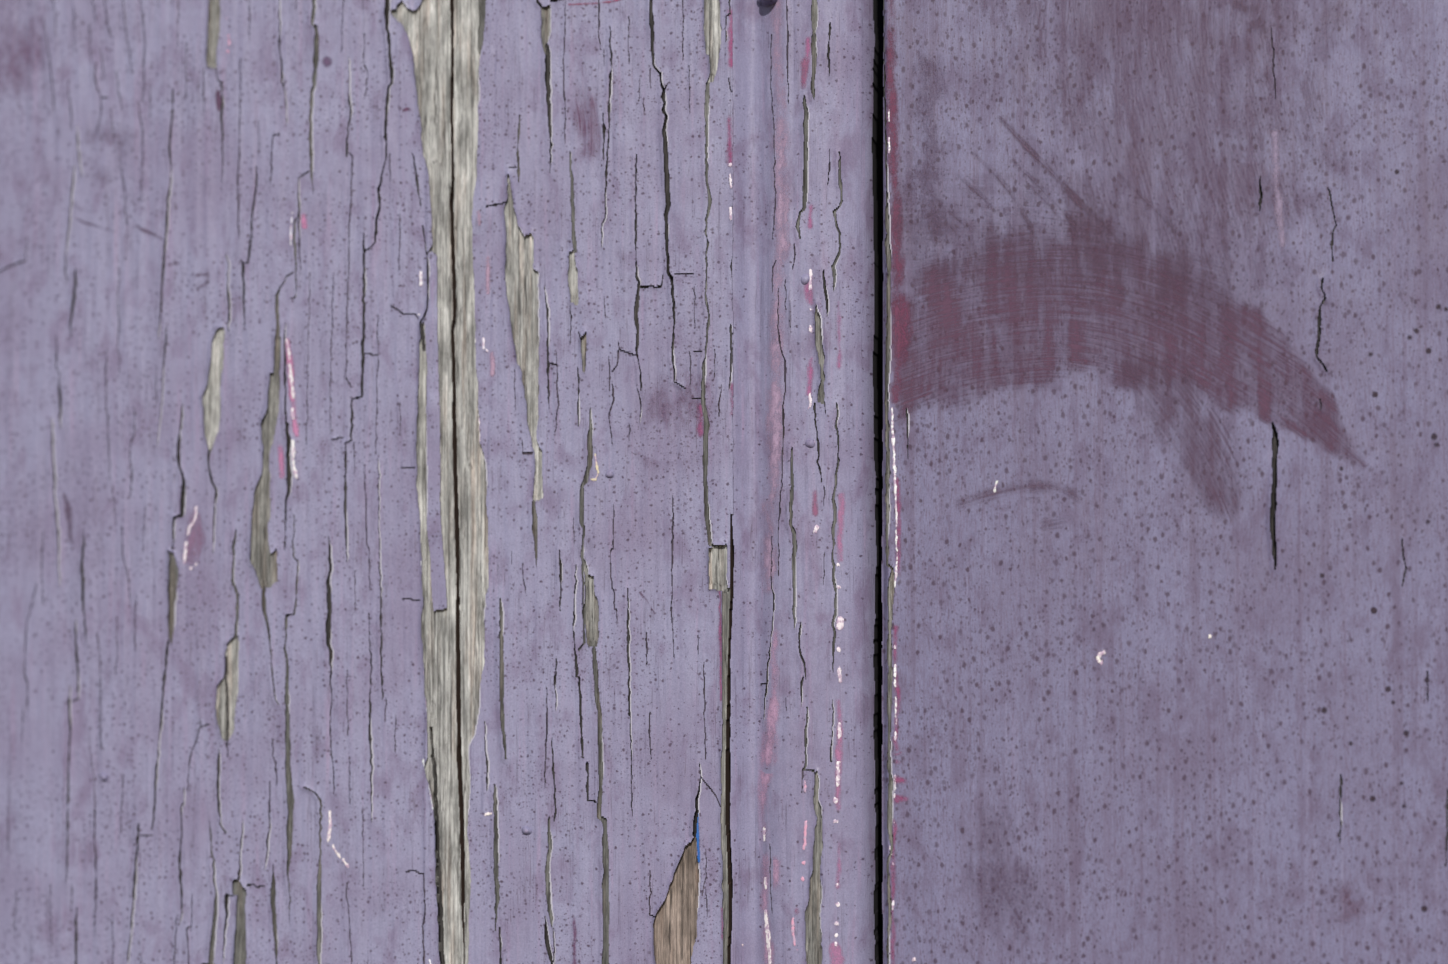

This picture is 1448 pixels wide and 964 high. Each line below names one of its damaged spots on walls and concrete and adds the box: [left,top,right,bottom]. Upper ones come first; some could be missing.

peeling [206,0,231,68]
peeling [202,327,225,451]
peeling [250,335,295,589]
peeling [391,0,492,964]
peeling [504,174,543,501]
crack [484,0,733,964]
crack [761,0,843,793]
crack [1270,422,1279,570]
crack [405,728,445,964]
peeling [653,837,700,964]
peeling [708,543,744,964]
crack [766,844,774,911]